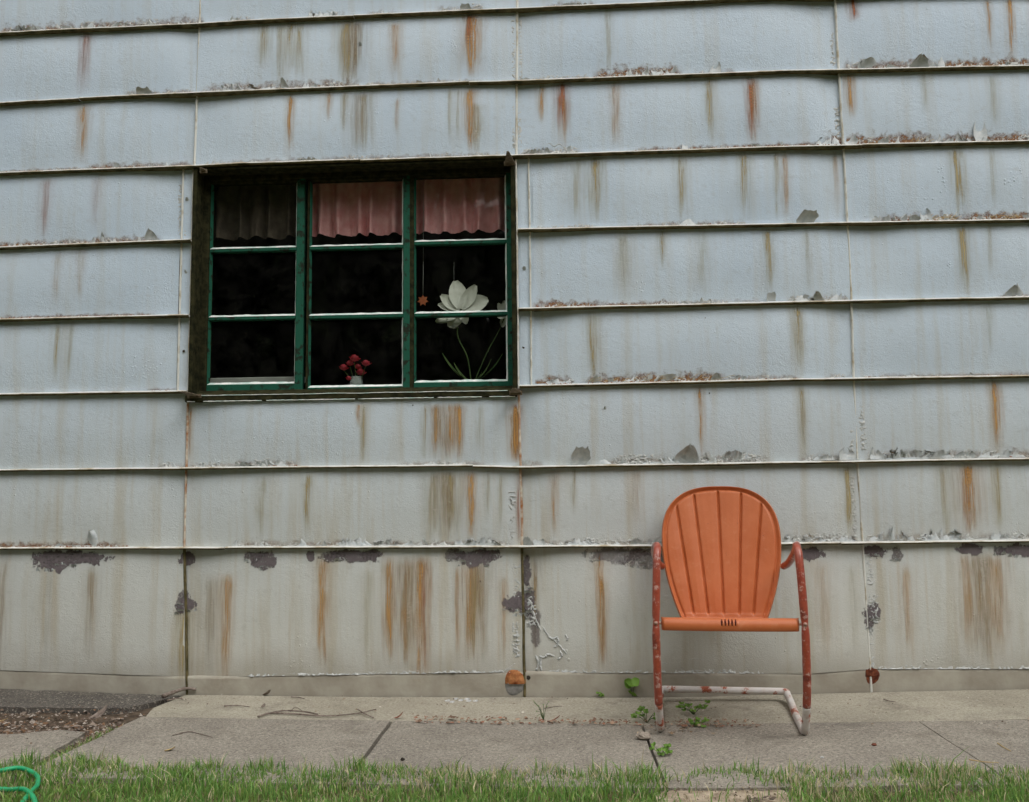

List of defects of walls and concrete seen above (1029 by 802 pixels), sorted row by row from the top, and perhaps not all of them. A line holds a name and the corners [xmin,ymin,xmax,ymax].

corrosion [466,17,477,69]
peeling [830,33,1029,69]
corrosion [467,89,478,142]
peeling [635,107,1029,151]
peeling [872,208,1029,221]
corrosion [425,406,461,446]
corrosion [511,406,519,452]
peeling [802,406,1029,461]
peeling [0,530,127,574]
peeling [174,590,198,615]
peeling [231,491,662,677]
peeling [784,528,1029,669]